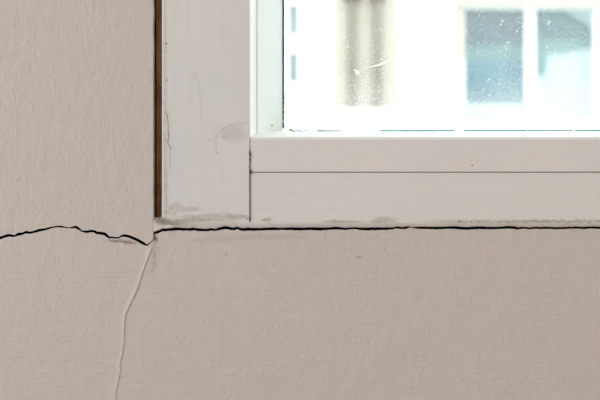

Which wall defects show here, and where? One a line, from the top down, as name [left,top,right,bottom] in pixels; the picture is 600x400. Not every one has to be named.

crack [0,226,600,246]